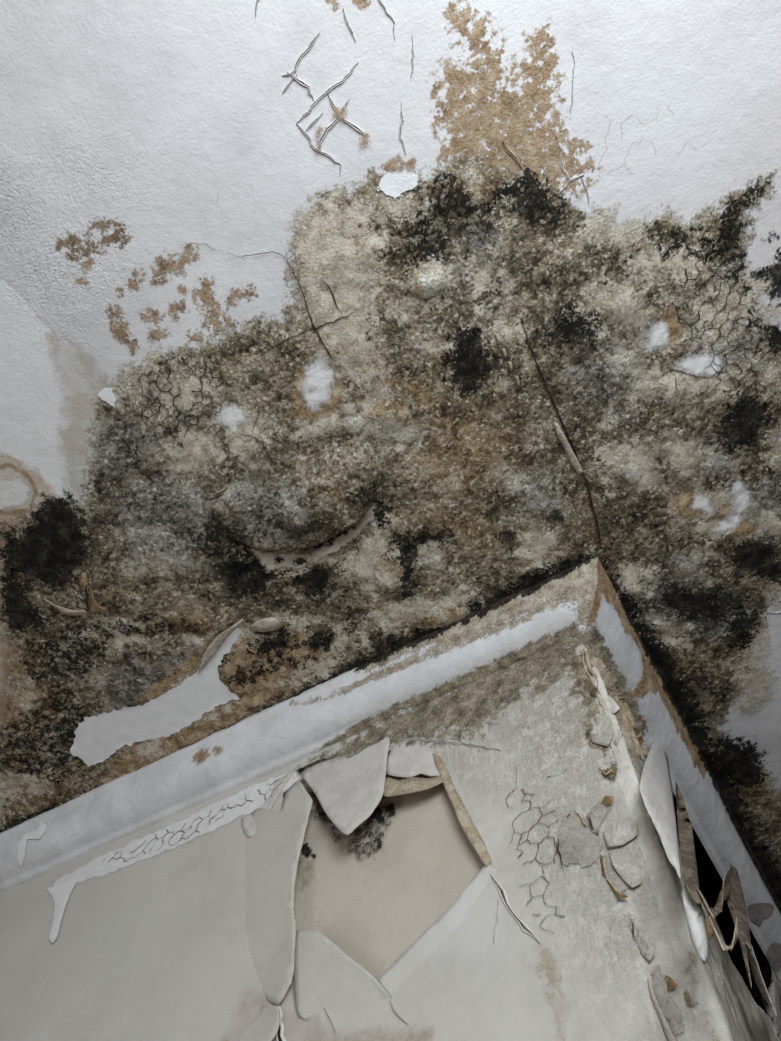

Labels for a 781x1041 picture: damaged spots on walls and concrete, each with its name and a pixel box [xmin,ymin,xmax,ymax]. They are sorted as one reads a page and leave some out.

crack [282,0,414,176]
water stain [0,151,781,903]
crack [494,322,602,548]
flaking render [70,614,338,786]
peeling [236,735,497,1041]
peeling [554,625,781,1041]
crack [276,975,294,1041]